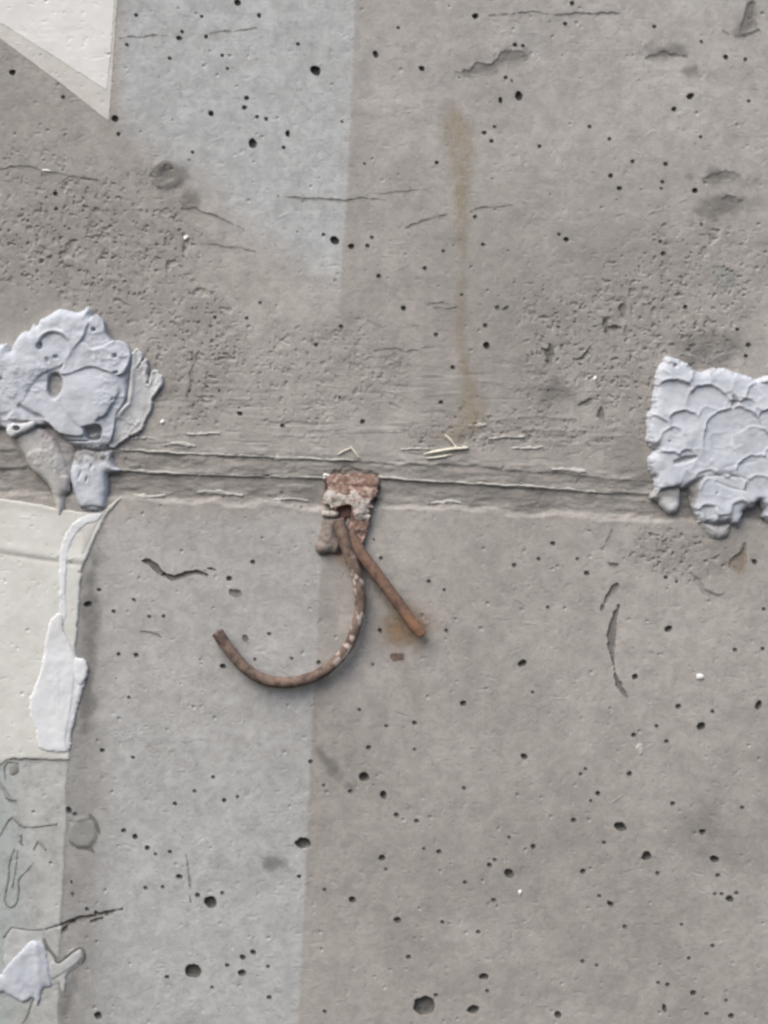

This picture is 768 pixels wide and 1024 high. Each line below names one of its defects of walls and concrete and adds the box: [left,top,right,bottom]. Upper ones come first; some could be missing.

crack [142,559,216,581]
crack [600,583,628,698]
peeling [0,926,85,1023]